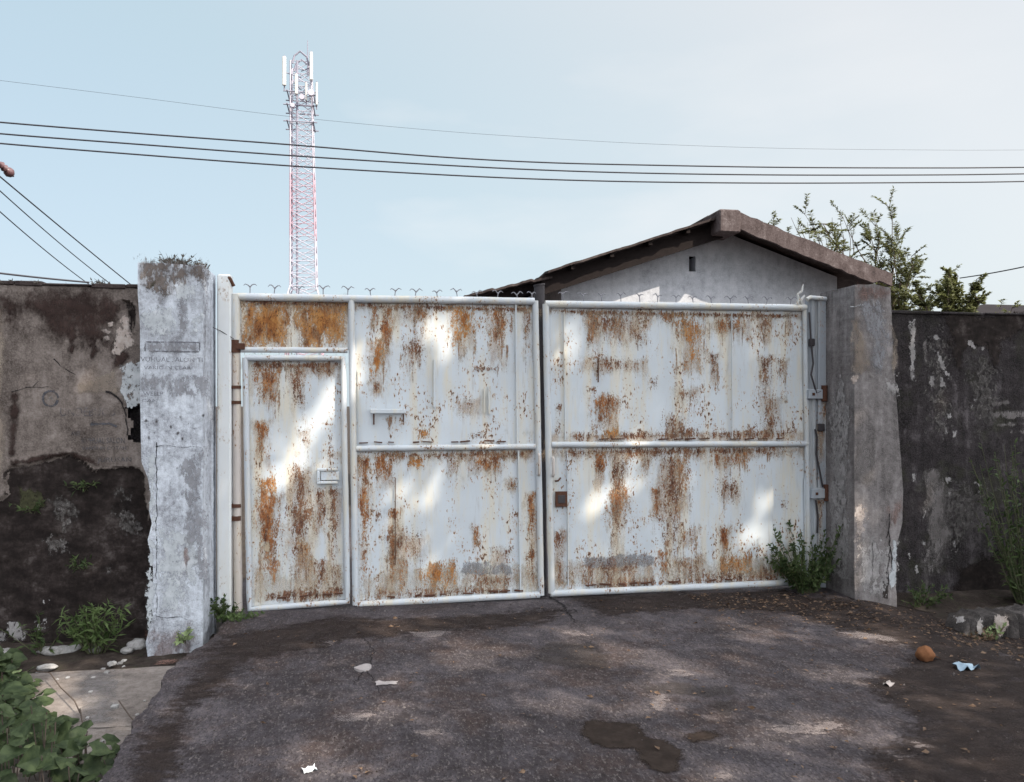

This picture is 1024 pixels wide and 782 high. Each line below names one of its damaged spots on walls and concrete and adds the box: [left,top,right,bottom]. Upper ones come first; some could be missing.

water stain [0,288,129,469]
peeling [101,280,209,443]
water stain [140,257,211,352]
water stain [892,319,927,380]
peeling [924,322,998,440]
water stain [945,308,1024,370]
water stain [991,400,1024,434]
spalling [0,452,206,643]
water stain [923,469,951,573]
water stain [953,547,1024,591]